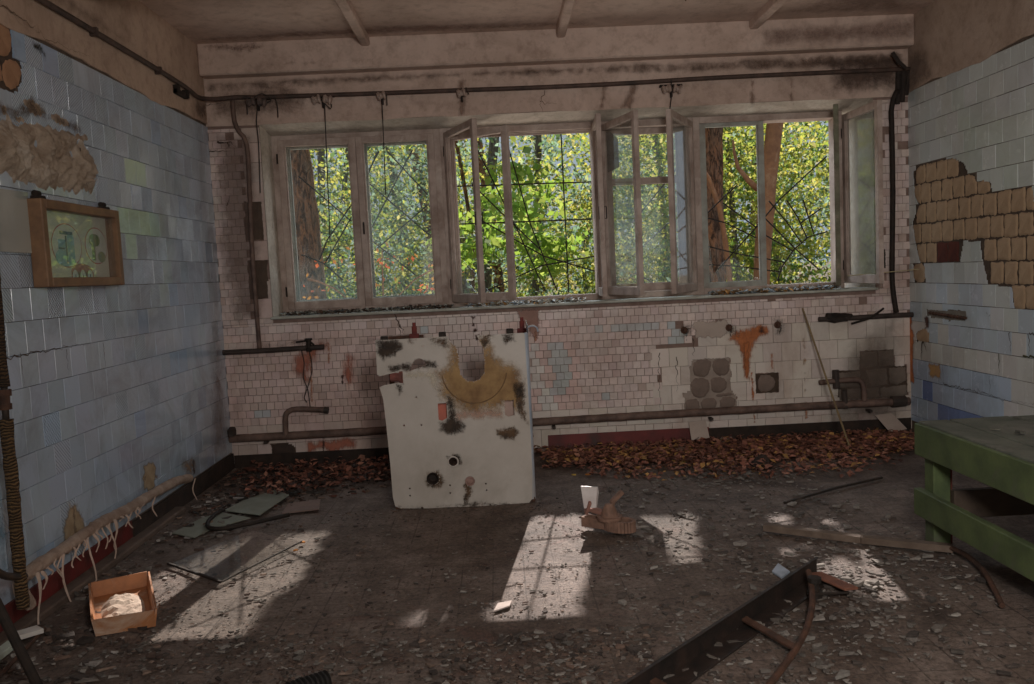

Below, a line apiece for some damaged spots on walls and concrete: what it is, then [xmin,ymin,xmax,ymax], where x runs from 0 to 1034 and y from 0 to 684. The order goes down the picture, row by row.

spalling [0,24,99,195]
spalling [913,158,1034,310]
spalling [683,358,737,409]
corrosion [730,325,768,400]
spalling [878,349,908,398]
peeling [64,505,84,540]